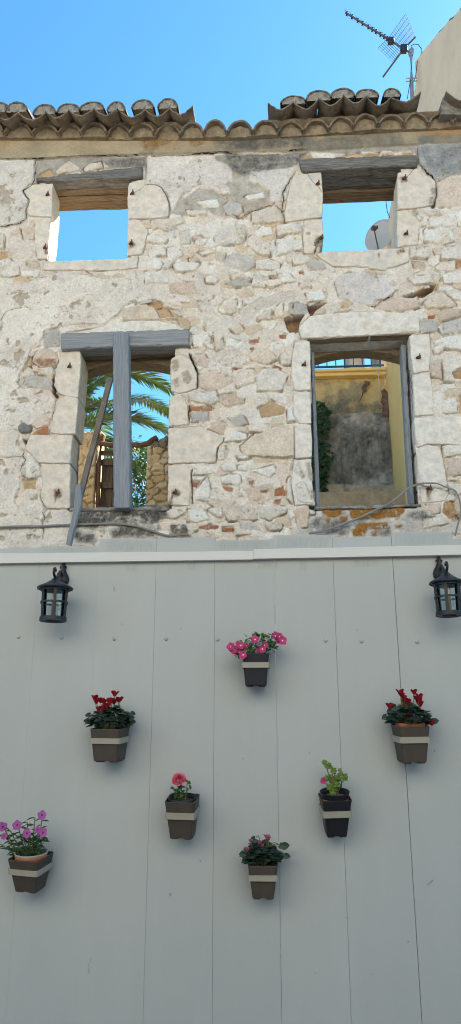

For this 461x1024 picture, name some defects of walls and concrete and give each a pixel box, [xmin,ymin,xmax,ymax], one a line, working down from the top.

leakage [75,503,188,542]